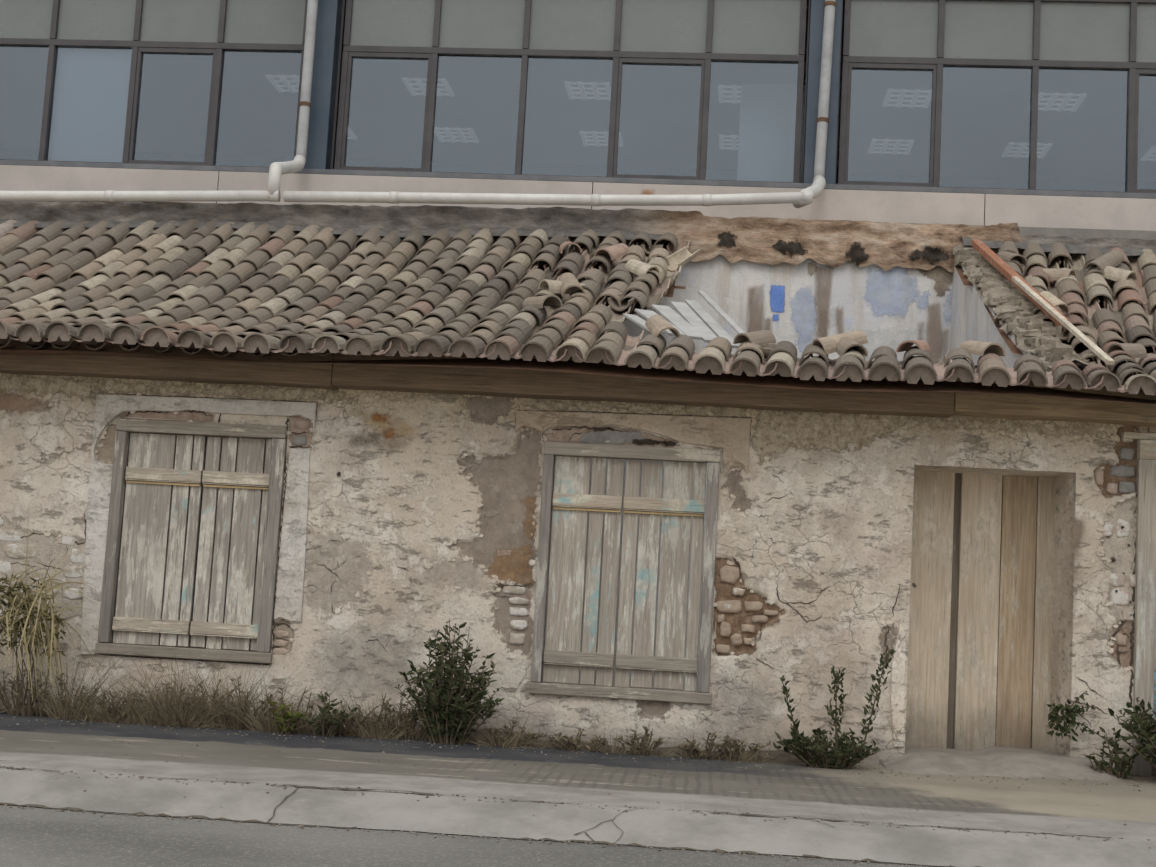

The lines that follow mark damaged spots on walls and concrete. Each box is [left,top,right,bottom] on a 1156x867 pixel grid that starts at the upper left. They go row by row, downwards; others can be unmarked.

spalling [95,410,221,464]
flaking render [0,374,347,415]
flaking render [285,416,317,448]
spalling [457,394,520,428]
crack [10,514,86,571]
spalling [446,426,685,659]
flaking render [543,399,1141,673]
flaking render [271,619,298,655]
crack [0,777,434,828]
crack [510,800,771,855]
crack [692,810,1111,838]
crack [803,854,902,864]